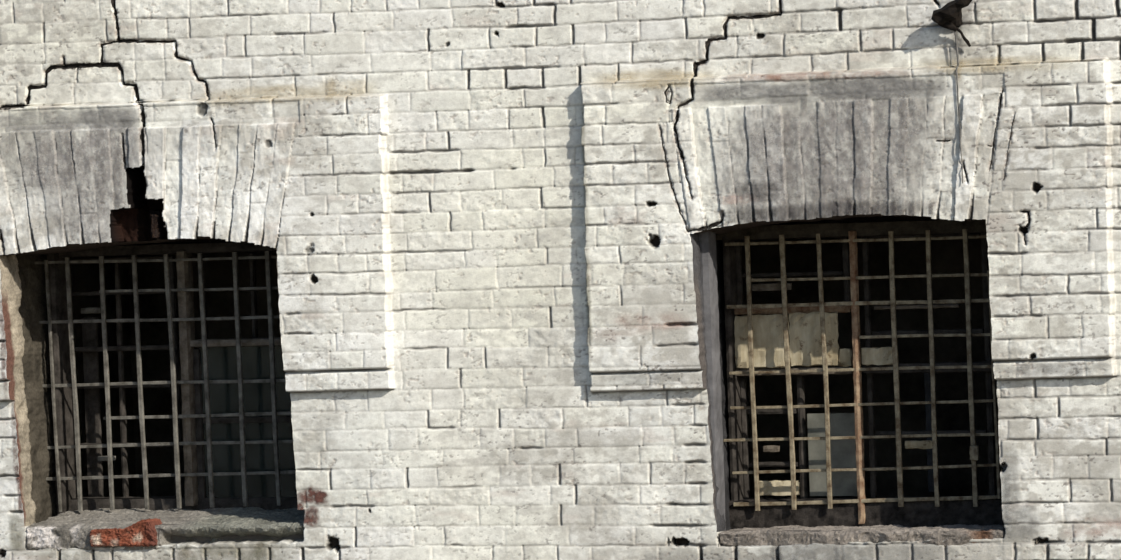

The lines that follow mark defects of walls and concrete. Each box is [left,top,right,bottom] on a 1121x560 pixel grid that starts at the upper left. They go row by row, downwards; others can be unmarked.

crack [0,0,216,166]
crack [660,0,782,232]
crack [936,90,1015,182]
spalling [135,168,168,242]
spalling [90,518,163,547]
peeling [297,487,327,526]